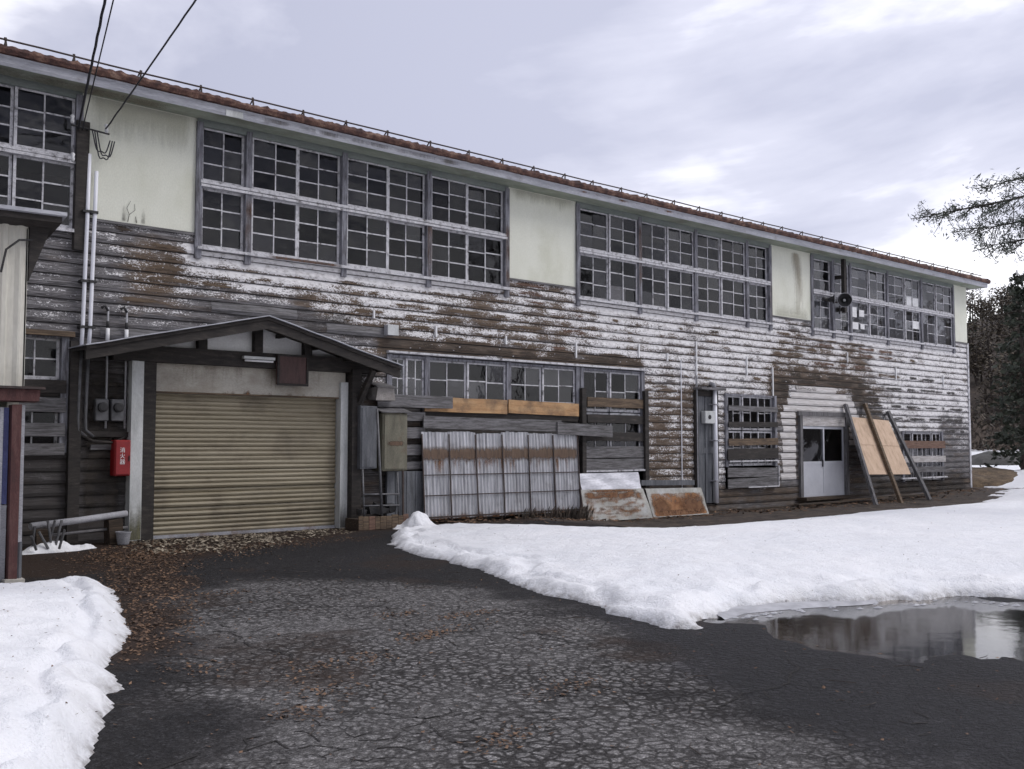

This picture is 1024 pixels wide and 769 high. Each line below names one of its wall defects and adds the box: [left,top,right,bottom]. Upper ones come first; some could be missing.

peeling [513,282,546,305]
peeling [343,303,643,364]
peeling [752,332,955,395]
peeling [890,405,964,433]
corrosion [423,447,577,469]
corrosion [431,488,709,521]